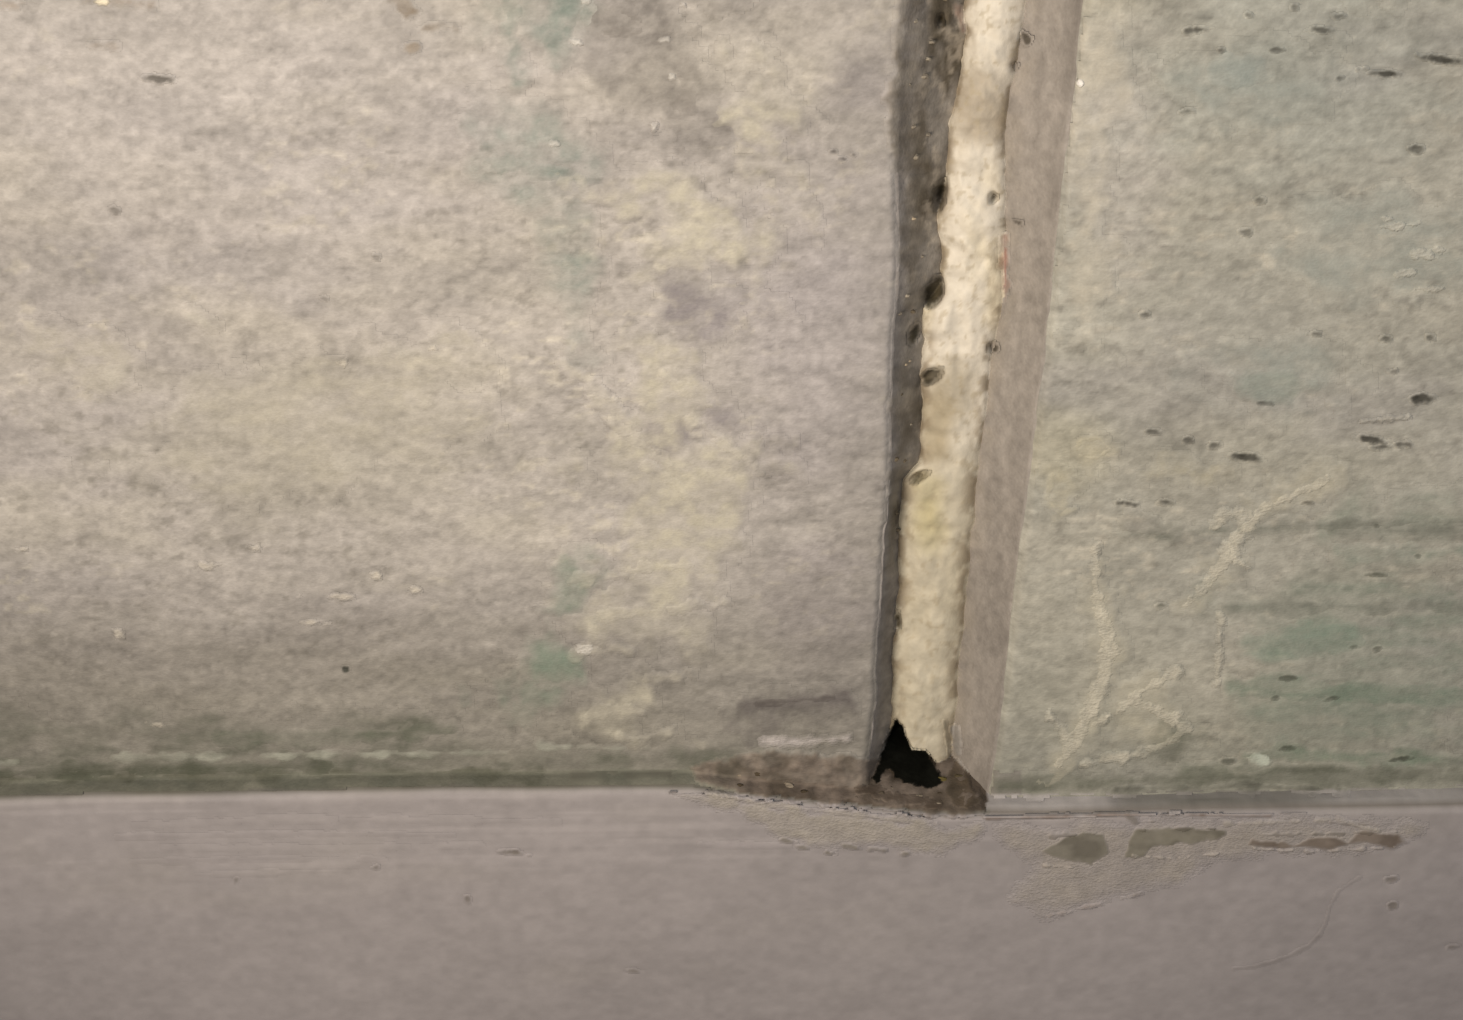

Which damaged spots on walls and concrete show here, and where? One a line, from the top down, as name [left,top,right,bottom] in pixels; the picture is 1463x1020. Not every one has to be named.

leakage [0,0,862,795]
spalling [688,718,986,820]
peeling [1041,825,1227,869]
peeling [1248,830,1410,855]